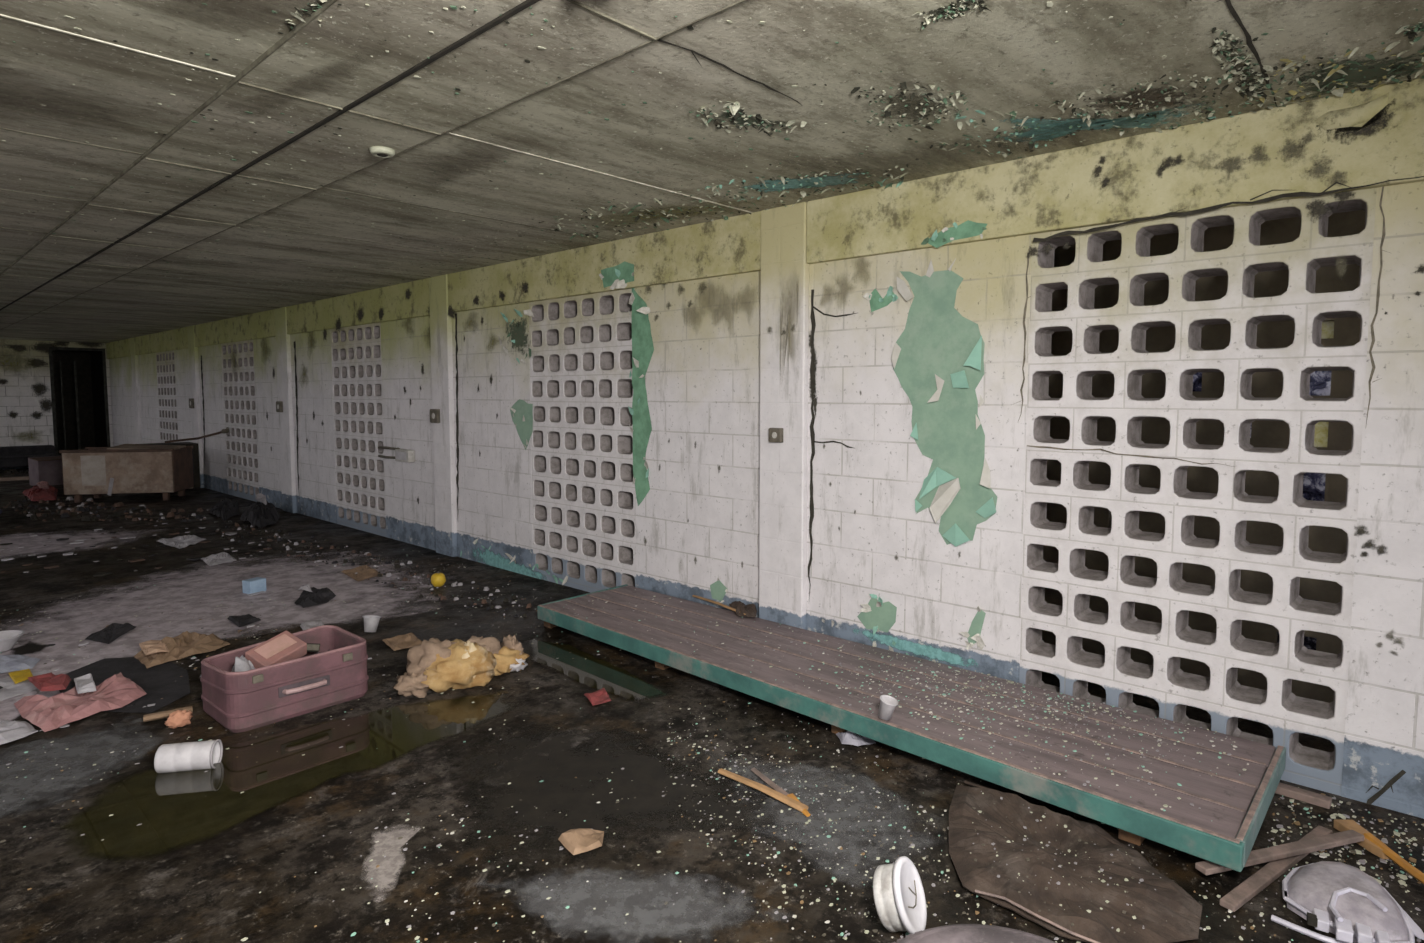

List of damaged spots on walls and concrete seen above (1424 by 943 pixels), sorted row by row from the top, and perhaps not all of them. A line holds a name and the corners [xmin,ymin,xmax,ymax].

crack [1217,0,1277,107]
damp [1094,156,1110,188]
damp [1156,155,1185,176]
damp [1215,133,1314,173]
damp [1306,162,1355,223]
damp [1027,243,1069,258]
peeling [498,309,534,365]
crack [1012,176,1424,467]
peeling [599,261,660,506]
peeling [863,220,997,557]
peeling [496,399,533,450]
crack [808,289,856,597]